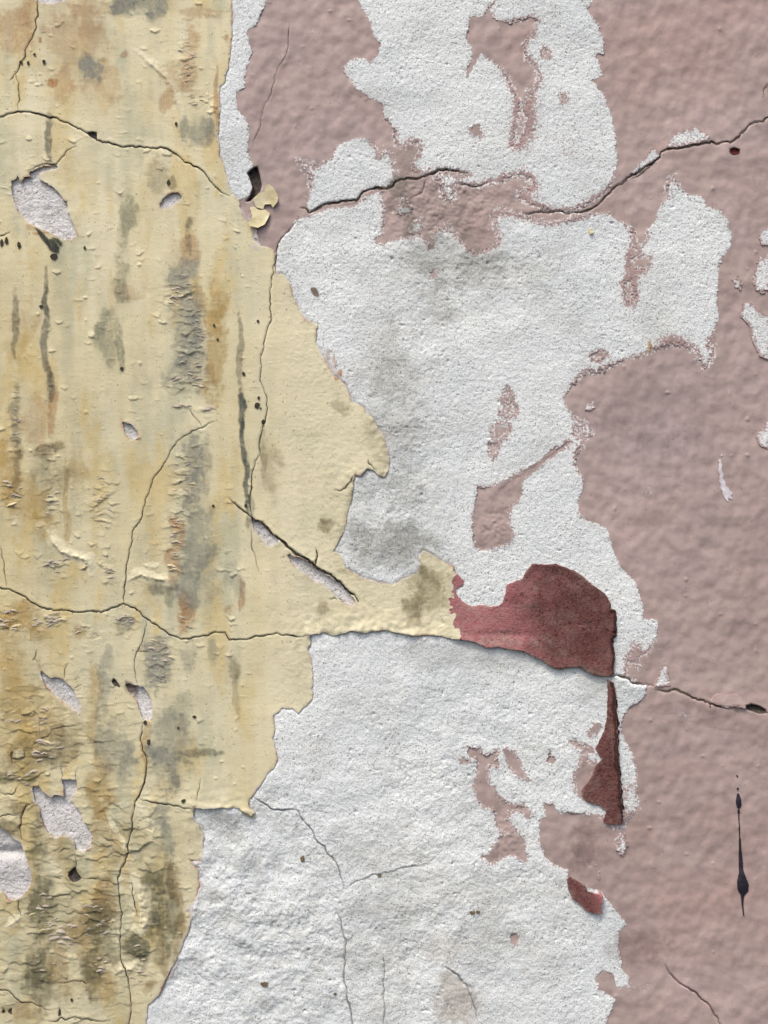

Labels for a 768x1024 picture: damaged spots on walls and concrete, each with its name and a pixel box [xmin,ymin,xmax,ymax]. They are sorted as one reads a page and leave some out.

water stain [79,56,104,81]
spalling [12,166,77,240]
crack [523,83,768,215]
crack [230,168,488,602]
water stain [239,389,266,508]
crack [0,410,306,682]
peeling [146,0,732,1024]
crack [610,675,768,713]
peeling [710,694,750,708]
crack [254,797,423,886]
crack [337,913,353,1024]
crack [379,953,387,1022]